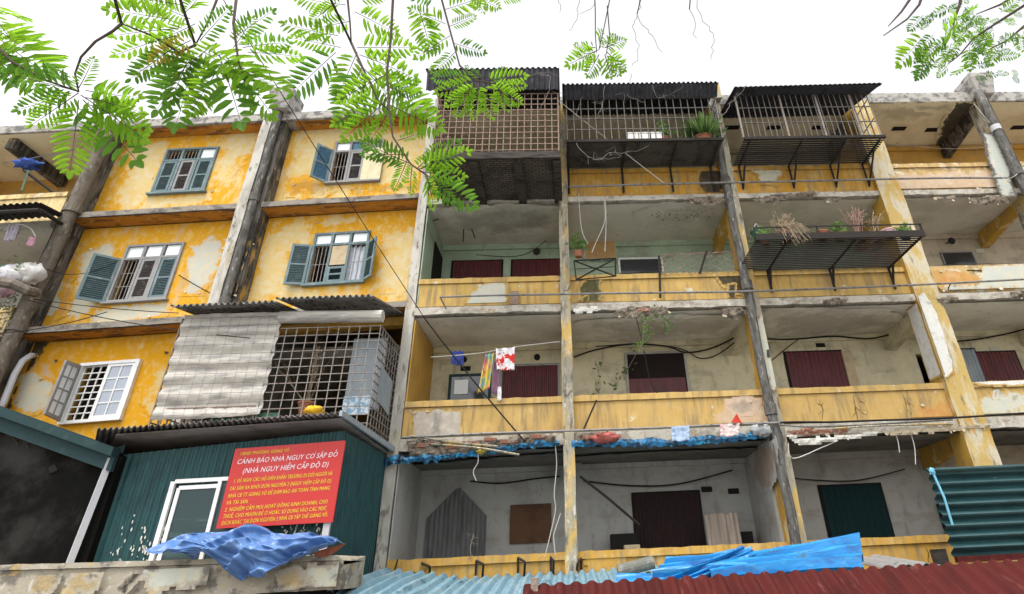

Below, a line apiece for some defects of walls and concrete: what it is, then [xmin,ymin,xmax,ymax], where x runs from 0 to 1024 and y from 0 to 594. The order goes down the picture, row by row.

peeling [47,234,228,323]
peeling [464,282,508,303]
peeling [928,265,1024,306]
peeling [786,388,1024,445]
spalling [406,433,557,456]